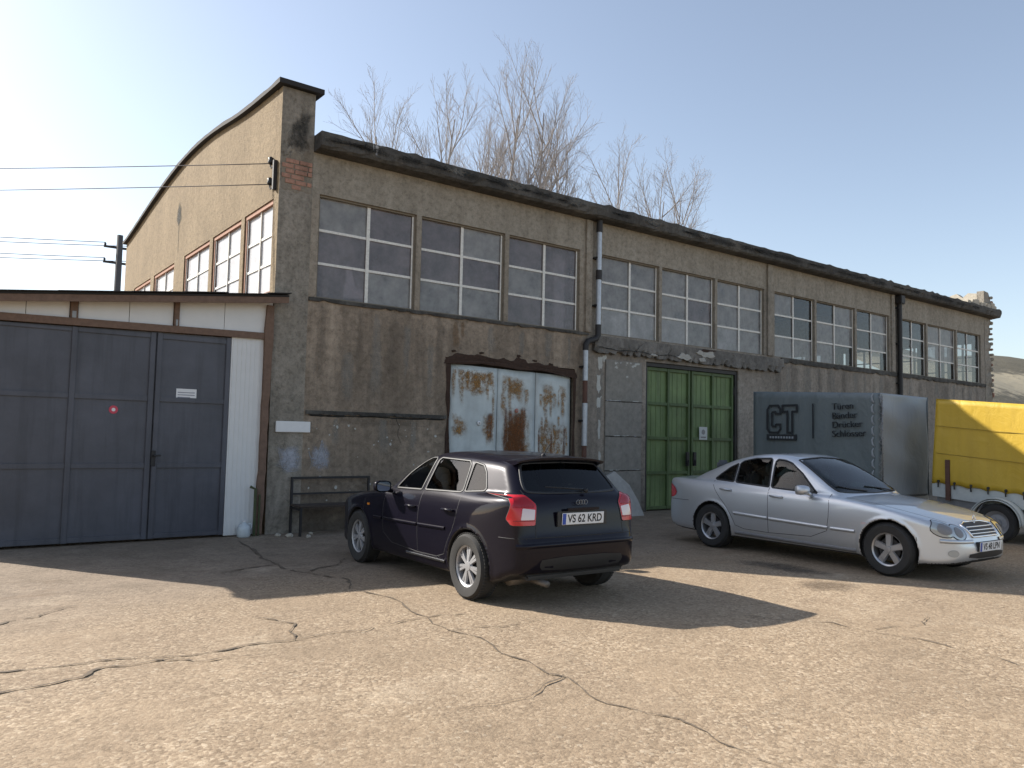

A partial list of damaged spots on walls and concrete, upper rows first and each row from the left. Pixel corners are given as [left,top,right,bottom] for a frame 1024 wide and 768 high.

spalling [280,146,313,195]
rust [452,370,567,454]
peeling [596,355,640,439]
spalling [678,349,716,362]
crack [0,541,782,767]